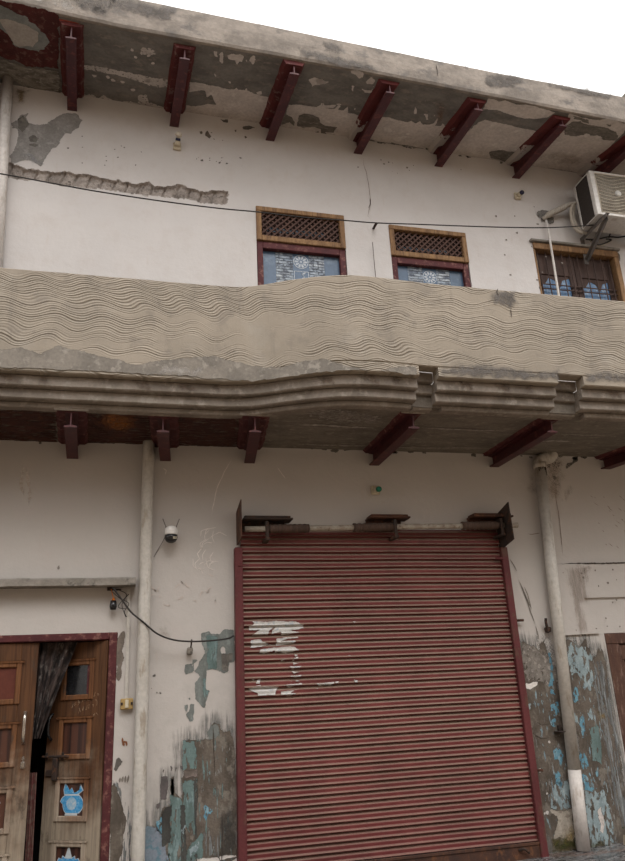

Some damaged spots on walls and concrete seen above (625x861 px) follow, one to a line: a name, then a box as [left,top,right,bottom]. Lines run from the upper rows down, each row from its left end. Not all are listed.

peeling [0,0,62,93]
spalling [8,113,229,205]
peeling [281,103,358,137]
peeling [369,107,445,150]
peeling [453,99,555,164]
peeling [532,114,625,172]
peeling [0,410,57,444]
peeling [116,631,125,681]
peeling [145,629,237,861]
peeling [520,636,577,854]
peeling [566,617,625,848]
peeling [110,758,132,861]